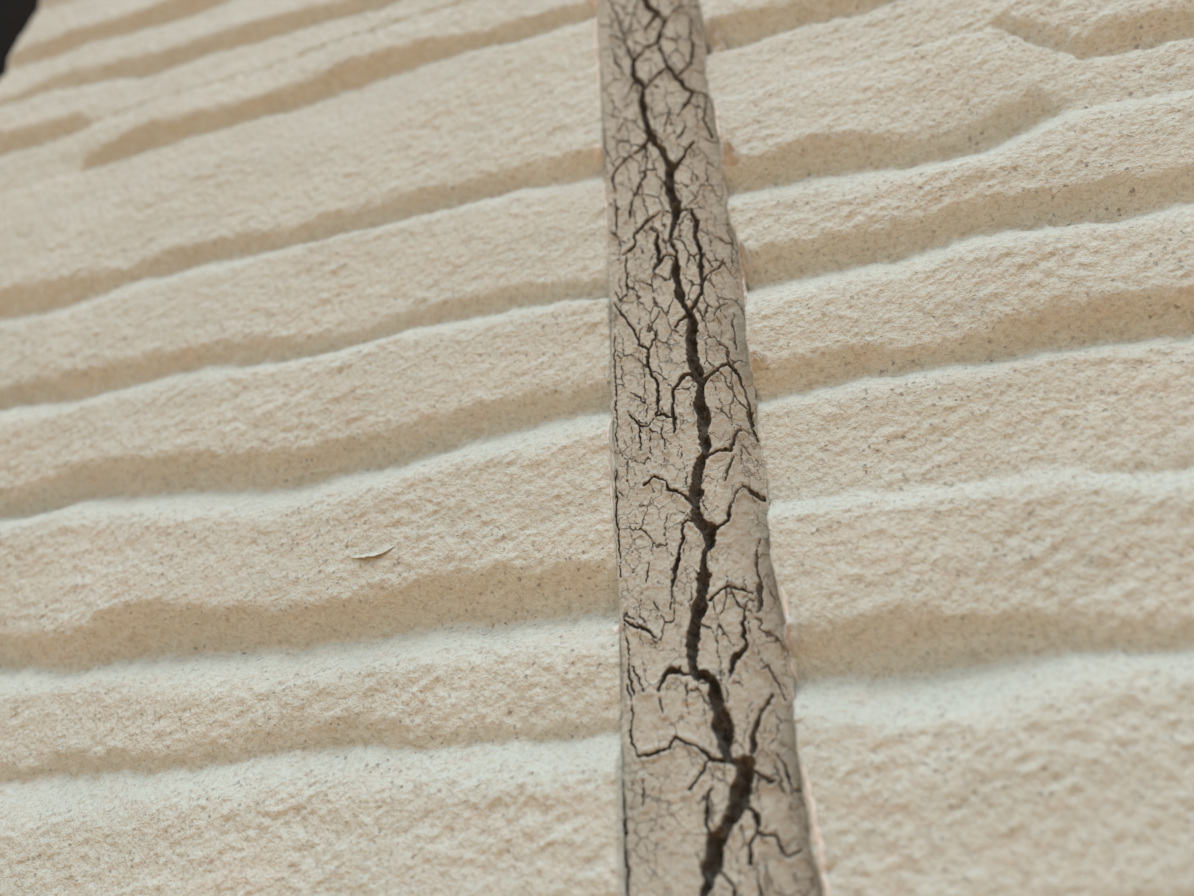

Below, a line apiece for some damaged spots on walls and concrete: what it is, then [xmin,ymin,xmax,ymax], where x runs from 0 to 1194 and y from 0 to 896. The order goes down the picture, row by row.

crack [598,0,816,896]